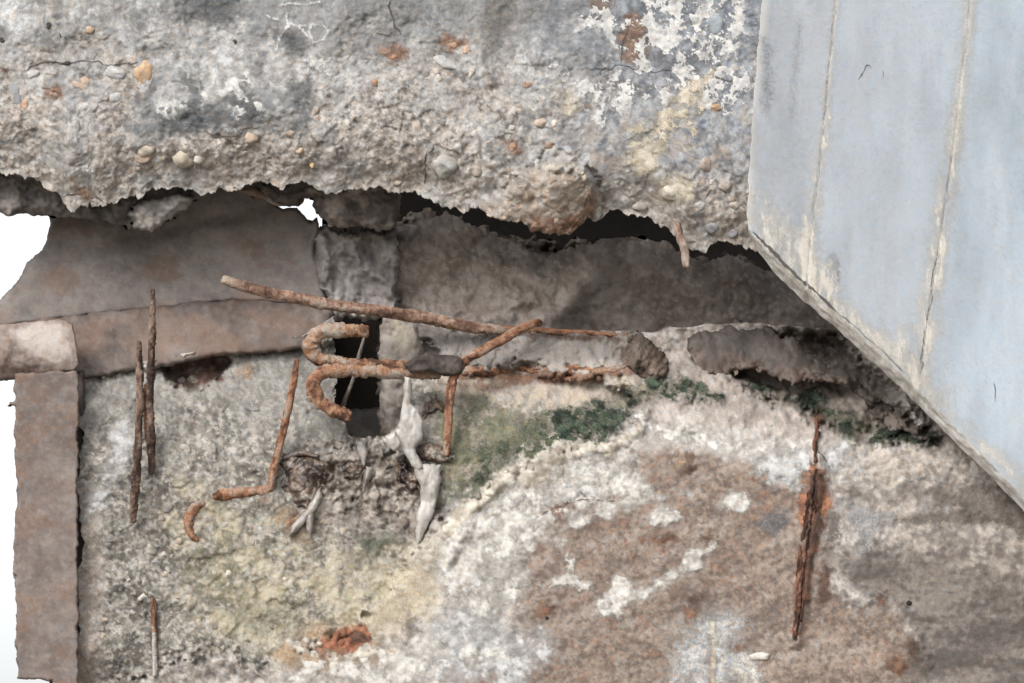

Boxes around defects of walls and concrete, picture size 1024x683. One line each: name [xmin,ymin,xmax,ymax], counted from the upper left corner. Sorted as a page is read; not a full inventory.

spalling [0,0,786,683]
water stain [285,408,810,683]
rust [796,461,832,604]
spalling [730,330,941,638]
water stain [824,440,865,484]
water stain [910,484,1024,539]